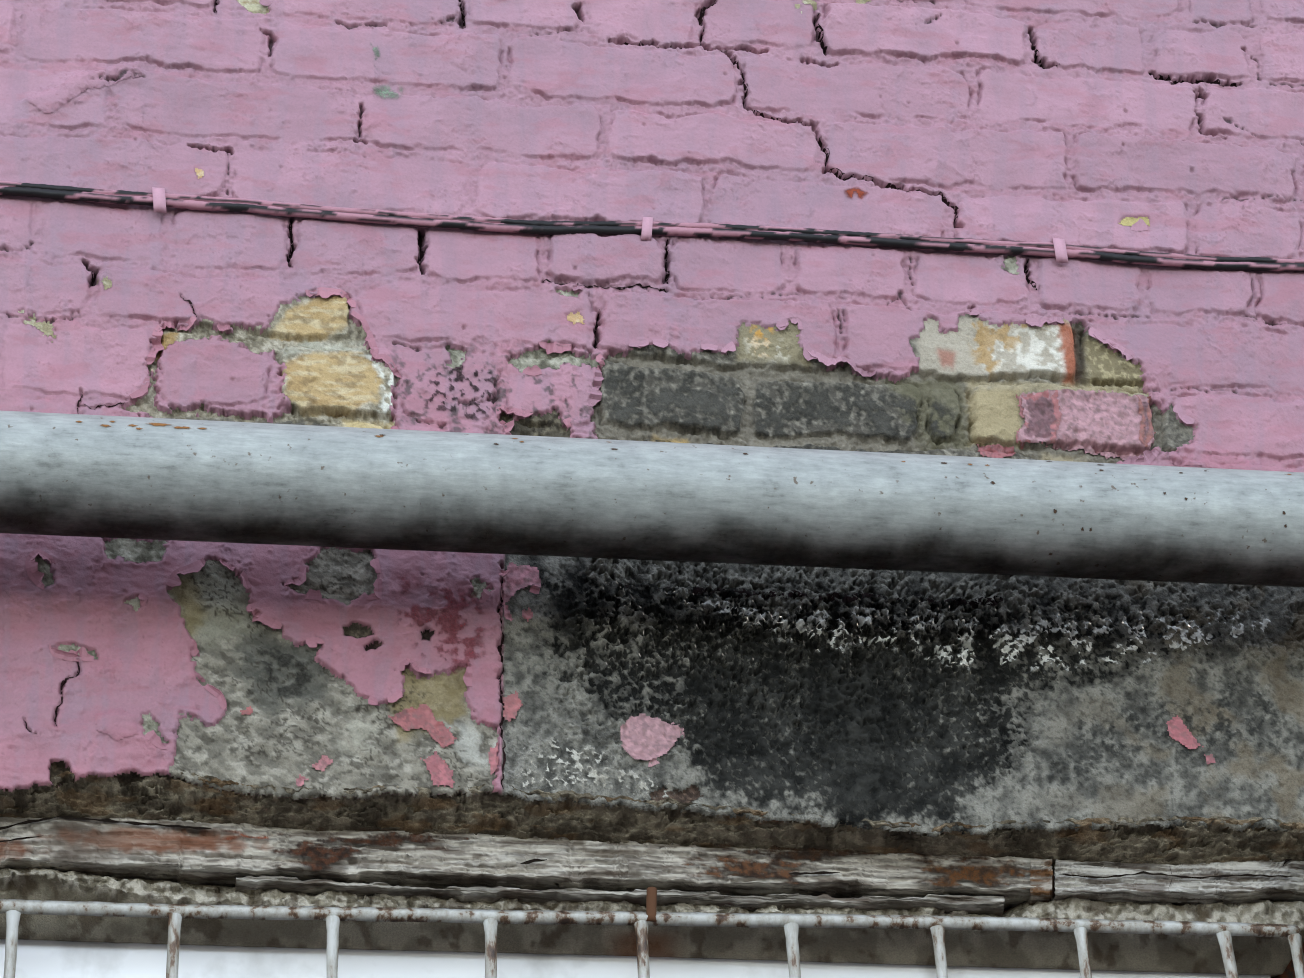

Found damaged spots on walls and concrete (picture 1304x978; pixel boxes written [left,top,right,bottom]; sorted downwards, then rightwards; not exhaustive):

crack [624,0,959,228]
peeling [556,282,585,325]
peeling [122,287,402,429]
peeling [496,308,1197,465]
peeling [25,549,56,590]
peeling [104,538,167,563]
peeling [284,547,382,606]
spalling [0,557,1304,870]
leakage [521,563,1288,834]
corrosion [225,829,448,870]
corrosion [682,843,880,884]
corrosion [917,854,1039,889]